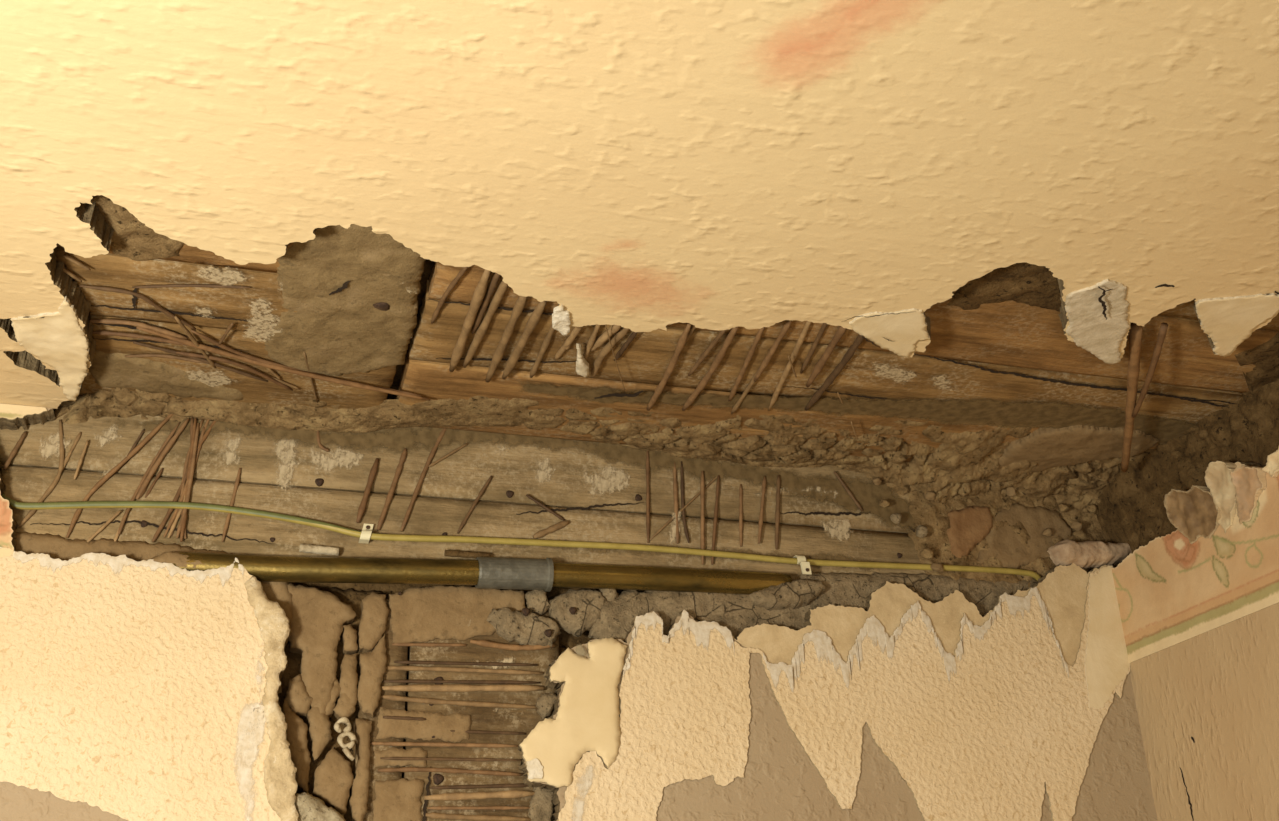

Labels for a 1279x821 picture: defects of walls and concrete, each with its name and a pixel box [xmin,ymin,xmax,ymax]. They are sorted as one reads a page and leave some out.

peeling [11,296,90,402]
peeling [552,304,571,336]
peeling [849,308,930,359]
peeling [1065,279,1130,365]
crack [1098,286,1112,319]
peeling [1195,293,1279,357]
peeling [1164,446,1279,544]
peeling [0,547,299,821]
peeling [519,563,1130,821]